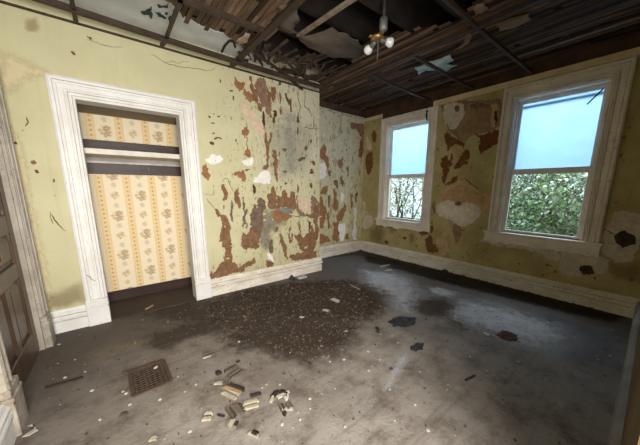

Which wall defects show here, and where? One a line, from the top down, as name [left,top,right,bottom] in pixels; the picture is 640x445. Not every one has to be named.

spalling [201,154,223,195]
peeling [210,76,395,279]
spalling [440,99,502,186]
peeling [419,220,462,255]
spalling [559,211,640,277]